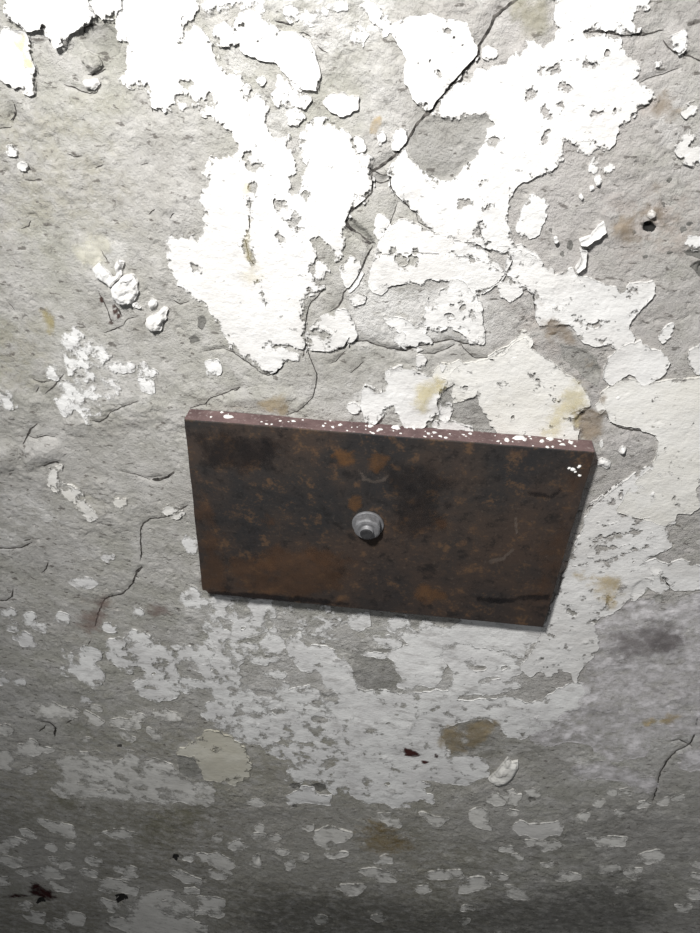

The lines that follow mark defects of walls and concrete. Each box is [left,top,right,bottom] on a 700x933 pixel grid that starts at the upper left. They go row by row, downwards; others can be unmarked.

peeling [671,29,689,56]
peeling [0,0,671,387]
crack [205,0,518,415]
peeling [674,130,700,166]
peeling [46,326,159,425]
peeling [346,329,590,440]
crack [88,505,188,645]
peeling [37,376,700,809]
crack [653,718,698,800]
peeling [0,818,310,933]
peeling [415,869,531,925]
peeling [468,787,582,882]